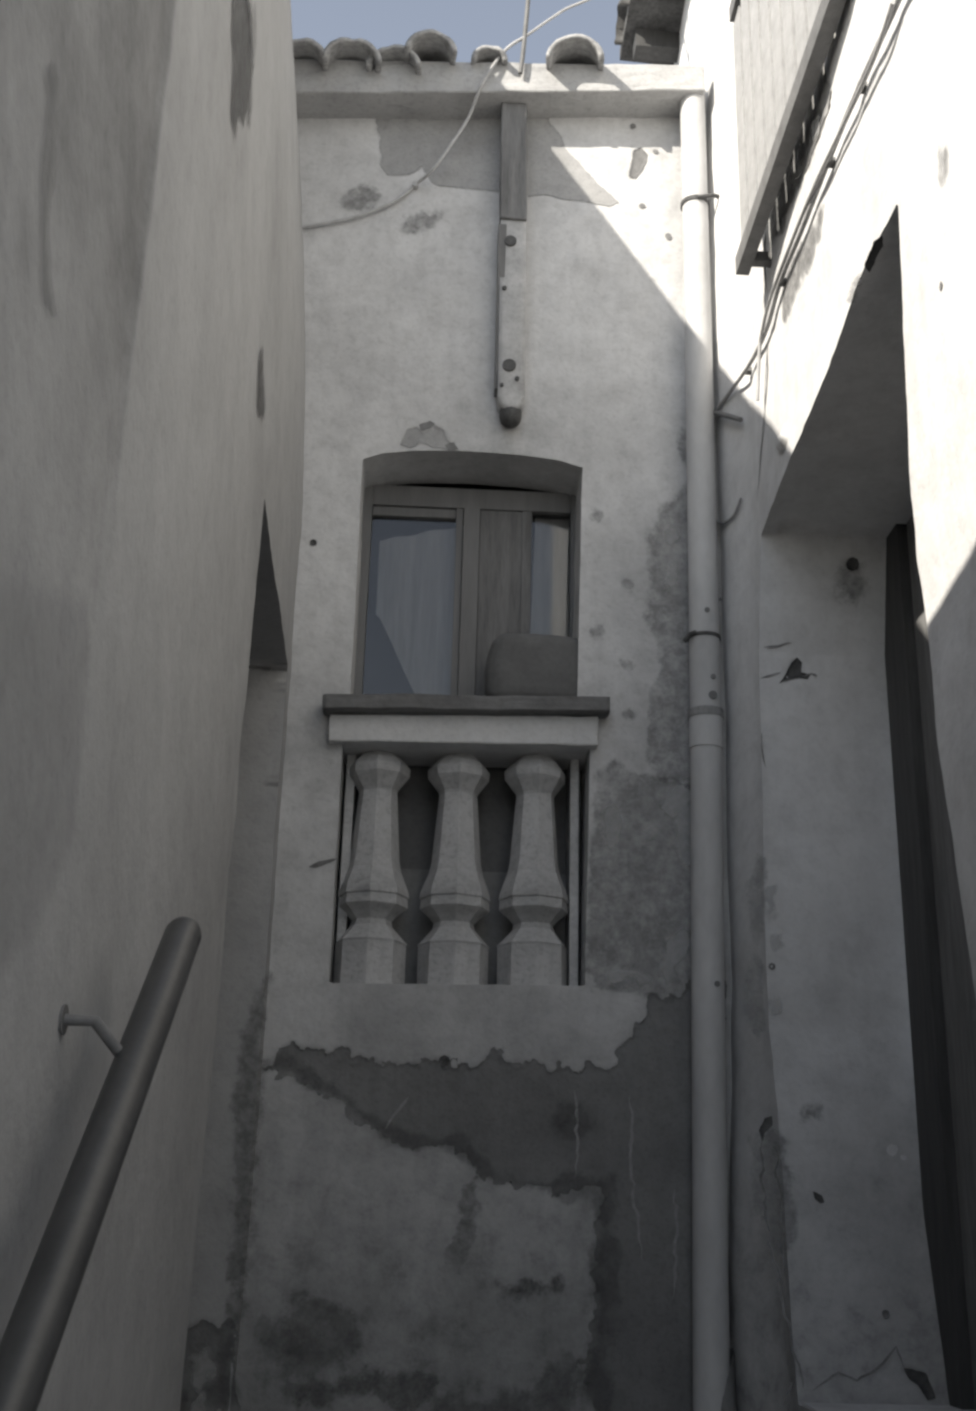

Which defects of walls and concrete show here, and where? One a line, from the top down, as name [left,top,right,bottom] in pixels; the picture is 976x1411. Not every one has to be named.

peeling [375,118,501,192]
peeling [527,118,618,206]
flaking render [629,147,658,179]
flaking render [400,421,458,451]
flaking render [762,642,817,684]
peeling [263,980,693,1411]